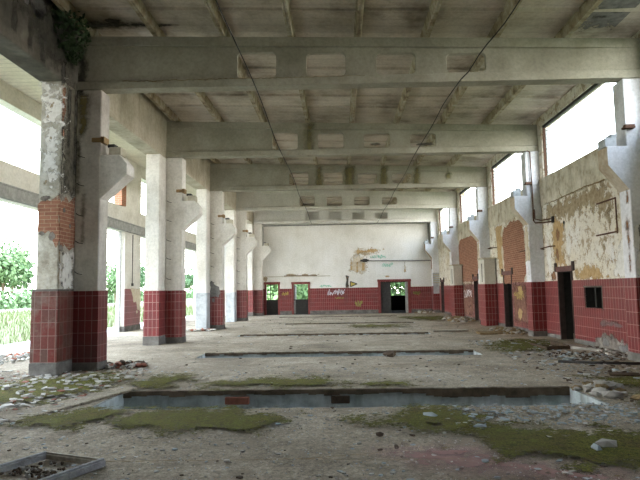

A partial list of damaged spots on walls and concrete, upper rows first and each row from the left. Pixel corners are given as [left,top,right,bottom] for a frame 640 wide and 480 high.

leakage [11,0,89,200]
flaking render [32,78,75,289]
peeling [350,247,384,274]
flaking render [544,182,625,280]